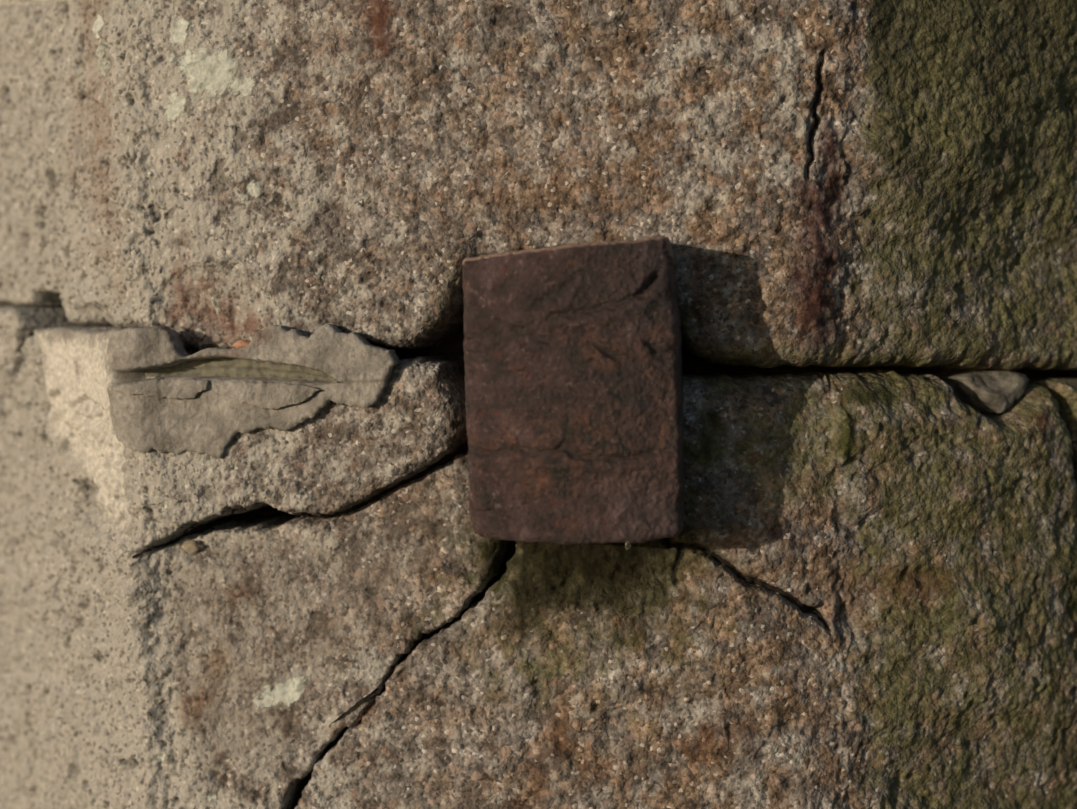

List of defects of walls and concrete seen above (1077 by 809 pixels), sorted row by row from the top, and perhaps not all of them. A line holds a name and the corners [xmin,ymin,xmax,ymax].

crack [807,52,824,178]
peeling [39,324,401,543]
crack [132,441,468,559]
crack [414,540,517,649]
crack [663,538,830,631]
crack [291,688,386,809]